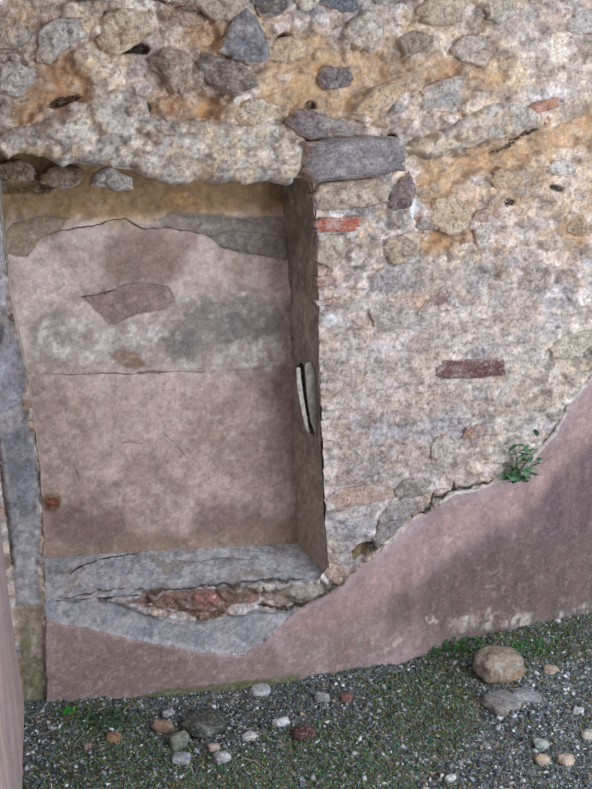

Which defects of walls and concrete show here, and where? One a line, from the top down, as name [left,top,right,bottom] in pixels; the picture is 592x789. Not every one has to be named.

crack [156,0,205,17]
crack [47,367,279,375]
spalling [0,211,341,656]
leakage [400,444,592,636]